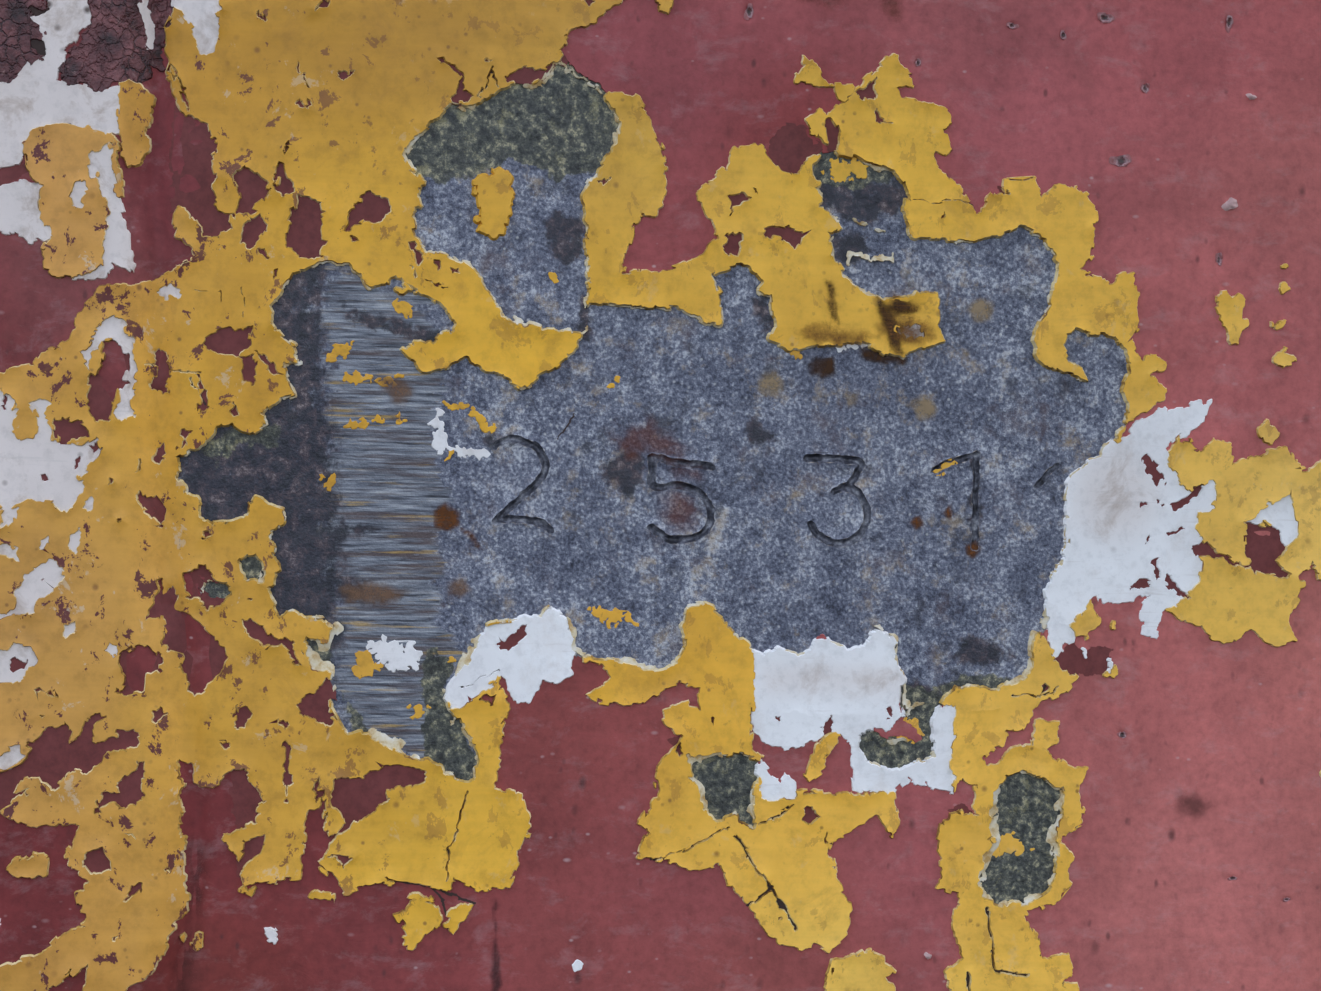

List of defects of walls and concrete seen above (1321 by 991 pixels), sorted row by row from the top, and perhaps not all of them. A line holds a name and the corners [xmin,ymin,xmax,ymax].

crack [29,6,50,56]
peeling [580,53,1167,444]
peeling [1214,290,1249,346]
peeling [0,0,623,991]
rust [434,504,479,547]
rust [967,543,980,558]
peeling [1130,418,1321,648]
crack [390,791,476,915]
crack [649,806,797,930]
peeling [582,601,900,991]
peeling [935,599,1118,991]
crack [966,907,1028,991]